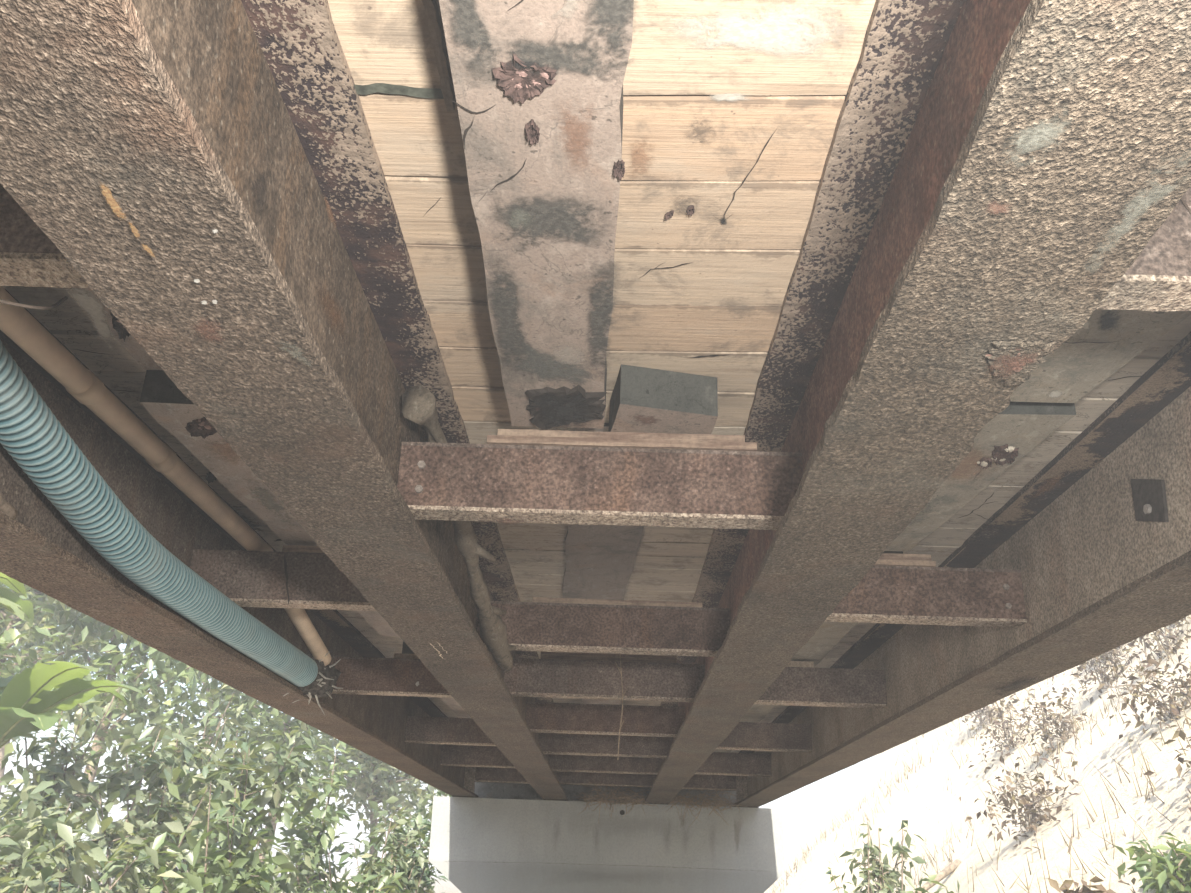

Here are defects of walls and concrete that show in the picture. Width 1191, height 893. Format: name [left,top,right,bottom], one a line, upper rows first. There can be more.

spalling [491,53,557,104]
water stain [498,198,597,248]
spalling [110,311,131,342]
spalling [185,417,217,439]
spalling [976,444,1019,469]